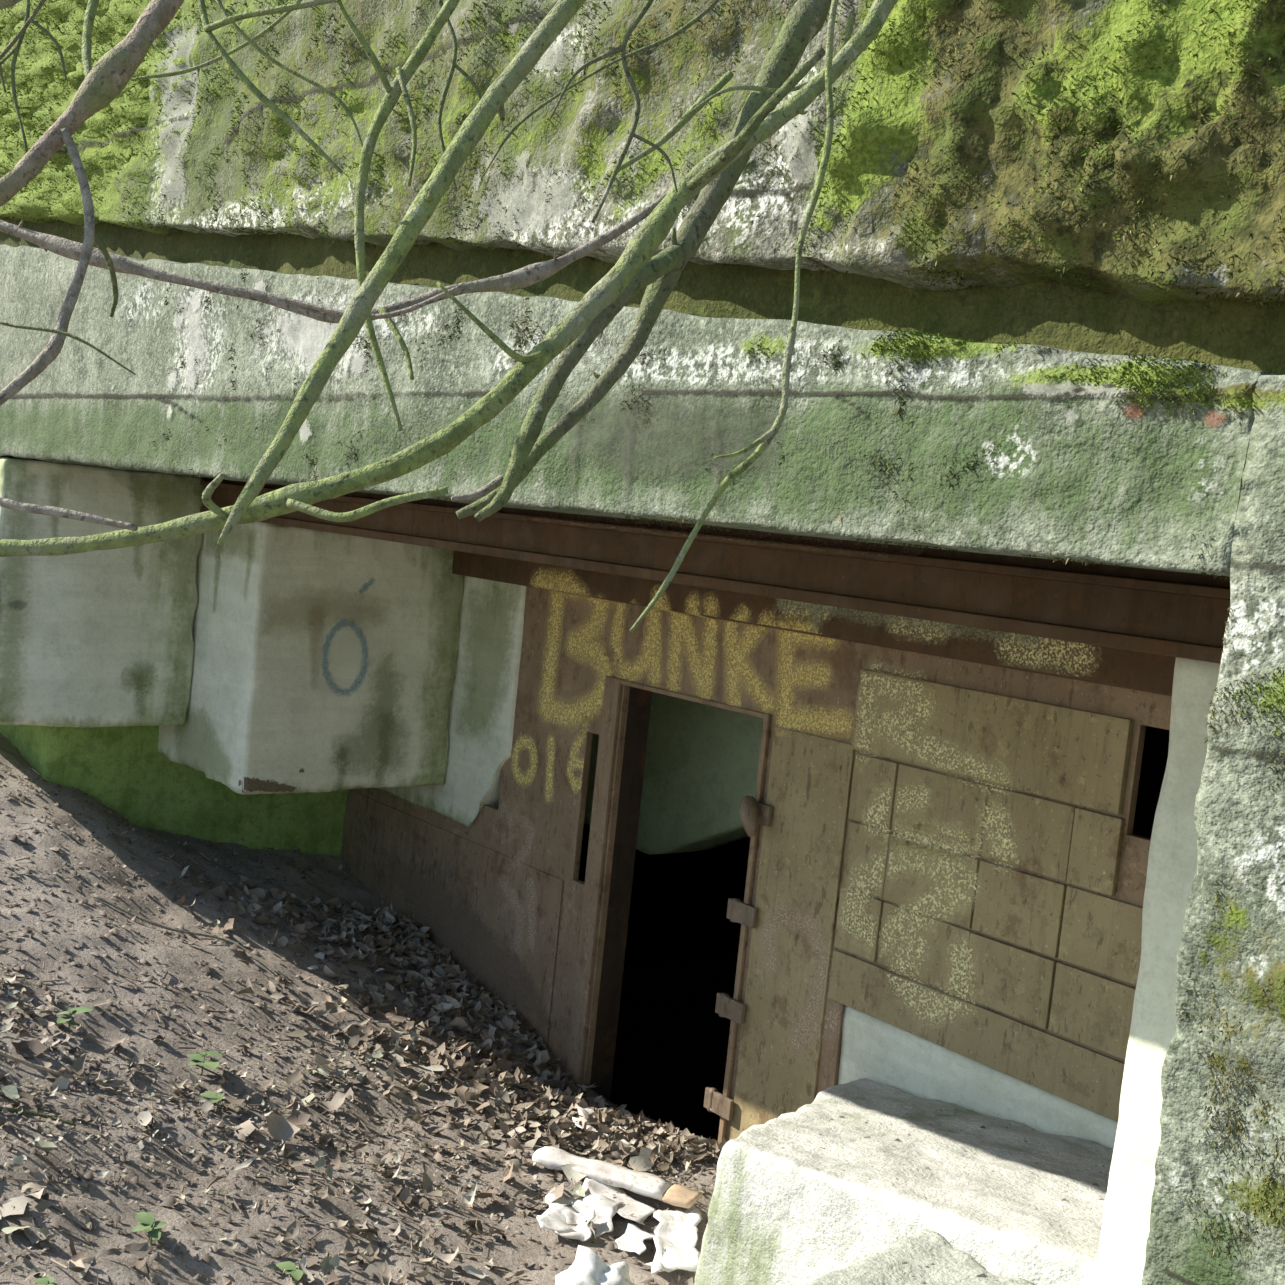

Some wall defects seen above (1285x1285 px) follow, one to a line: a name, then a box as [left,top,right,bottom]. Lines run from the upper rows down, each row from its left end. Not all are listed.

crack [1164,1269,1200,1285]